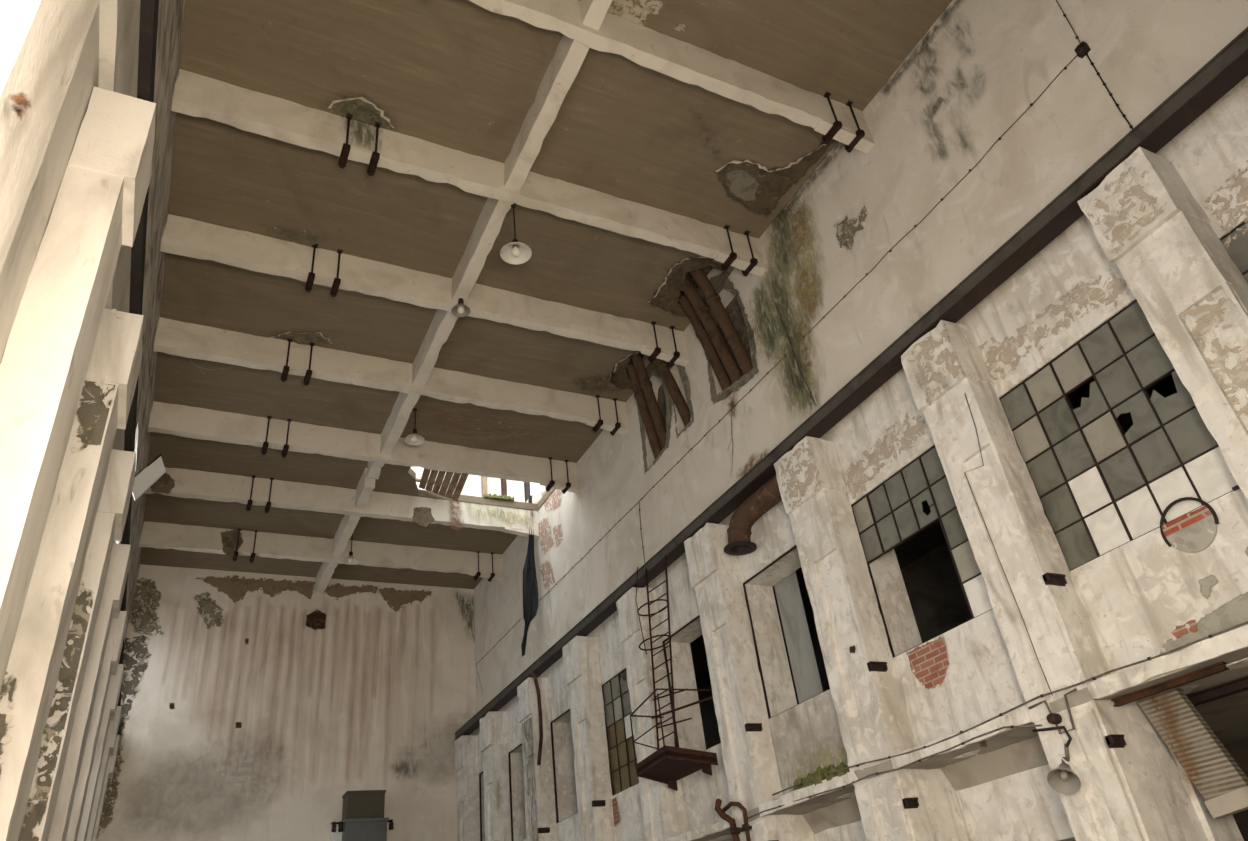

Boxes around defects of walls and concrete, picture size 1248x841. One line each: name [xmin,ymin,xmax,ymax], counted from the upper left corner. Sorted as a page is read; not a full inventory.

spalling [715,139,836,215]
peeling [1087,167,1166,253]
leakage [758,143,844,405]
peeling [979,272,1127,380]
peeling [1180,295,1248,417]
peeling [71,380,115,453]
peeling [0,672,17,775]
peeling [18,585,93,841]
peeling [97,578,163,838]
flaking render [195,575,432,630]
flaking render [906,637,949,690]
flaking render [1160,575,1248,655]